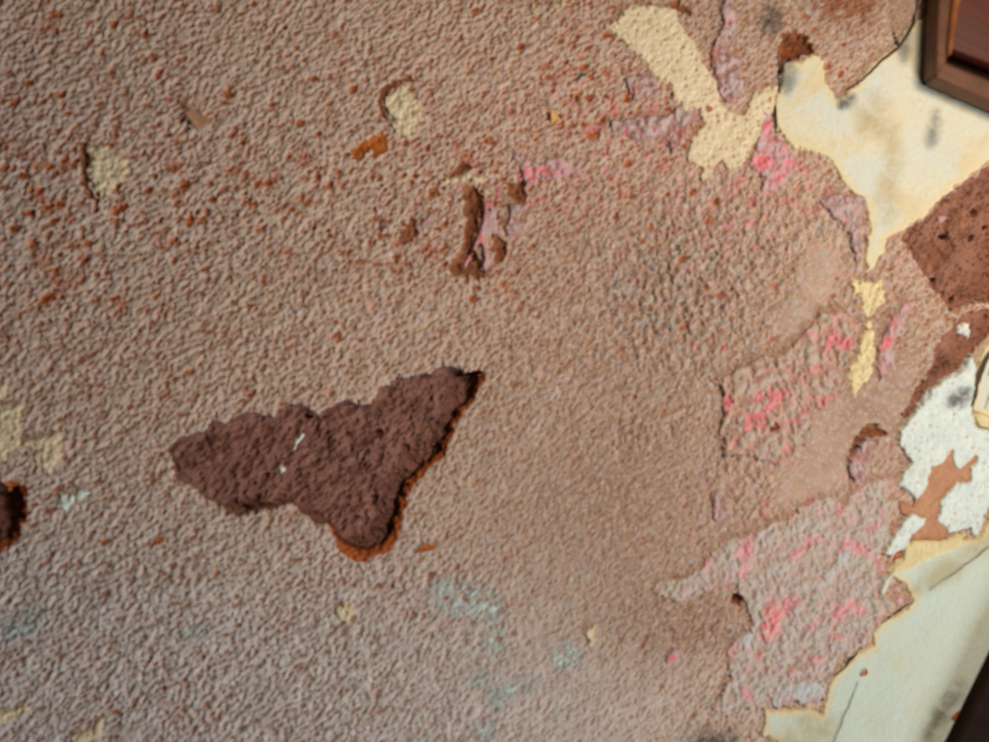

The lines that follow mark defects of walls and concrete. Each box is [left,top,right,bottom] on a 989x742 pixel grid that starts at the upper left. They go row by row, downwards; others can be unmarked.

flaking render [440,161,507,280]
peeling [604,0,989,742]